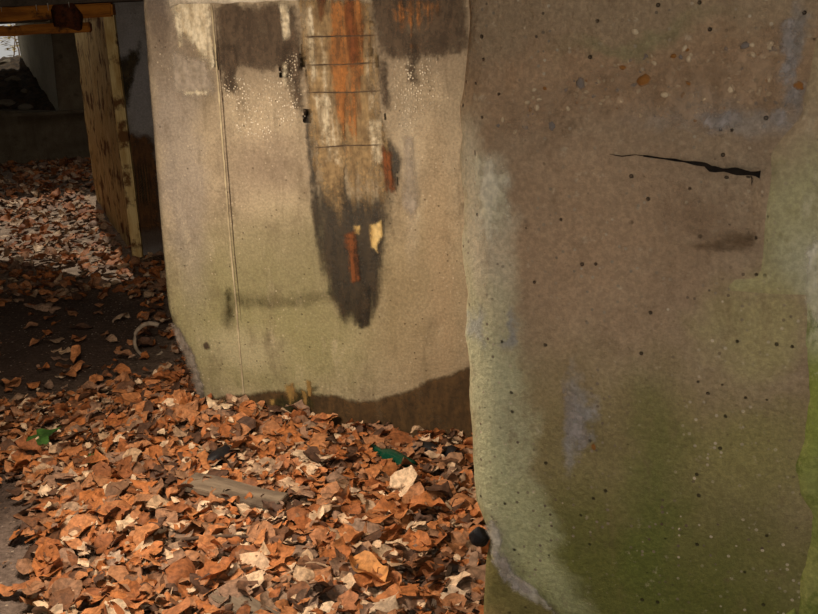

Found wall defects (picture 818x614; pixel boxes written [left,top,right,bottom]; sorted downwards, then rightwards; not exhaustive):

corrosion [317,0,363,135]
leakage [172,0,469,328]
corrosion [382,146,395,192]
crack [609,154,761,186]
corrosion [346,232,360,282]
peeling [370,222,382,250]